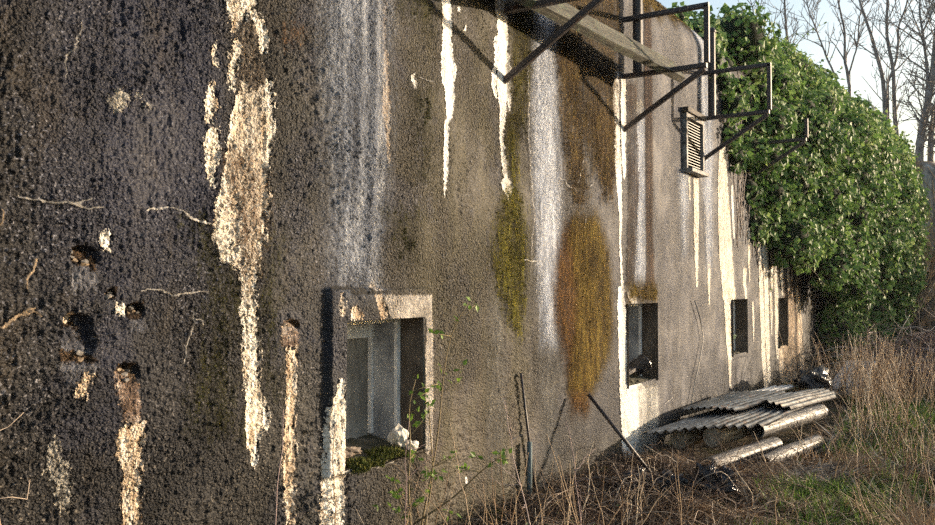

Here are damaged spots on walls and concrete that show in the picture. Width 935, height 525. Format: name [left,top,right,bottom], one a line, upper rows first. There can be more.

peeling [99,228,111,253]
spalling [70,243,146,334]
peeling [202,0,278,470]
leakage [326,0,391,290]
peeling [441,0,461,195]
peeling [491,0,513,200]
peeling [688,143,804,388]
peeling [114,362,147,525]
peeling [280,319,300,525]
peeling [317,378,351,525]